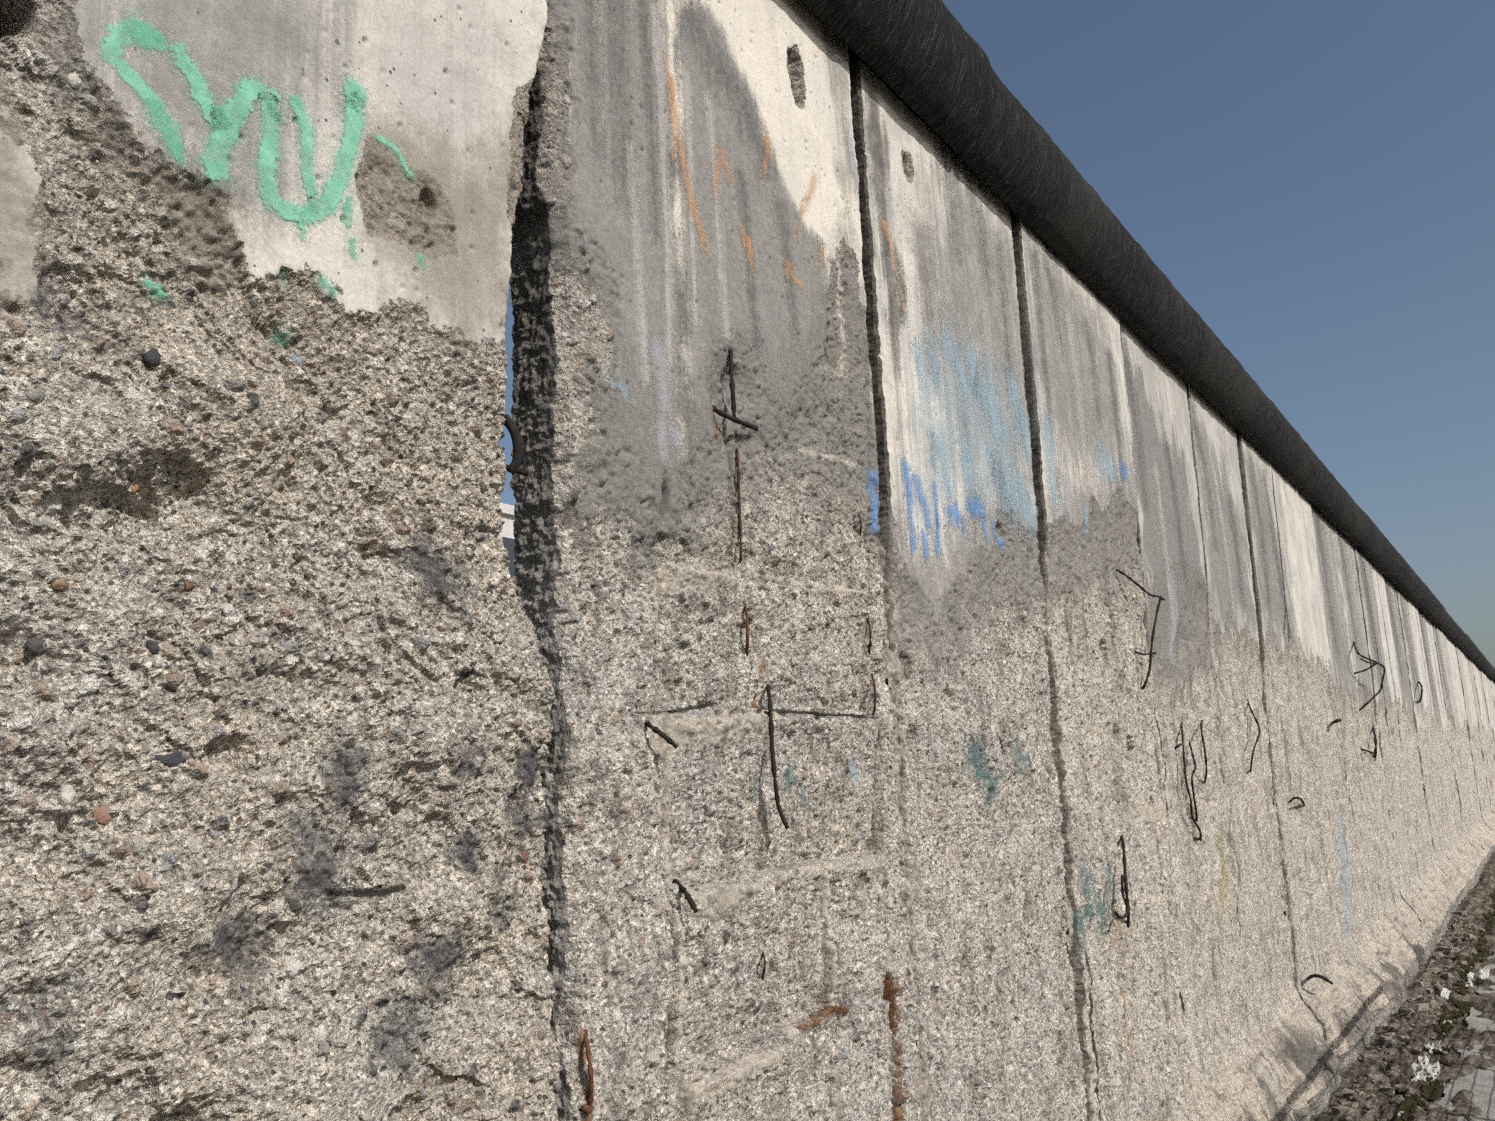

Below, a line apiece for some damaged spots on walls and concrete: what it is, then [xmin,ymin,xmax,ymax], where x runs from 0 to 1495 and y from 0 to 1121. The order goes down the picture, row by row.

spalling [0,0,924,1121]
spalling [890,487,1495,1121]
corrosion [575,1029,595,1121]
corrosion [796,1005,849,1031]
corrosion [881,973,905,1121]
crack [1085,951,1101,1121]